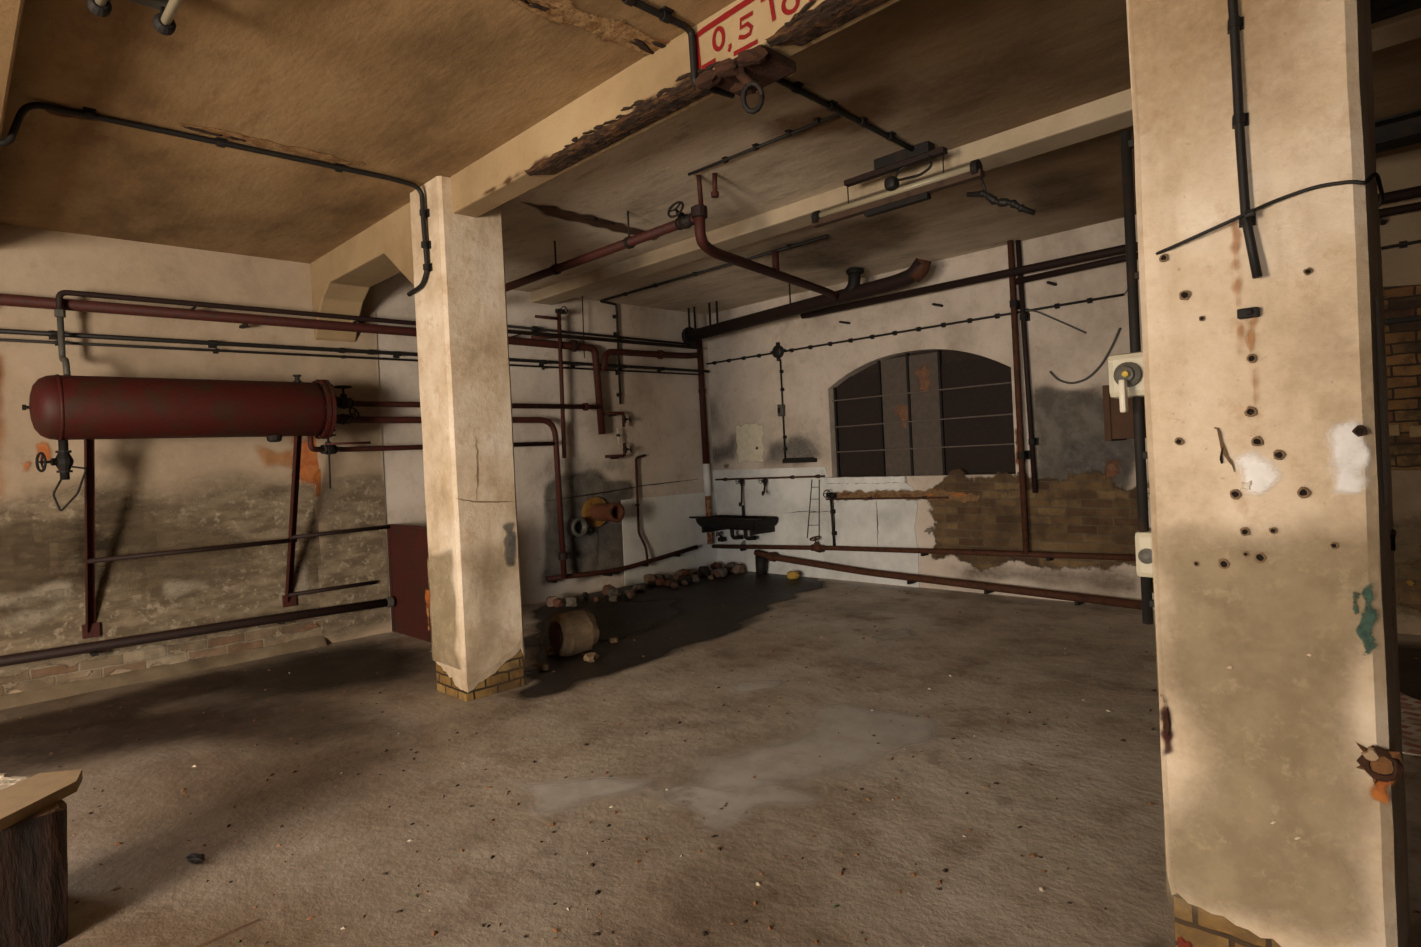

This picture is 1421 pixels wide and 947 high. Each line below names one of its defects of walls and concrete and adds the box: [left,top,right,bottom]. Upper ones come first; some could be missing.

spalling [513,0,670,56]
spalling [765,0,889,47]
spalling [485,61,720,194]
corrosion [260,437,321,496]
flaking render [834,430,1150,571]
water stain [0,477,459,768]